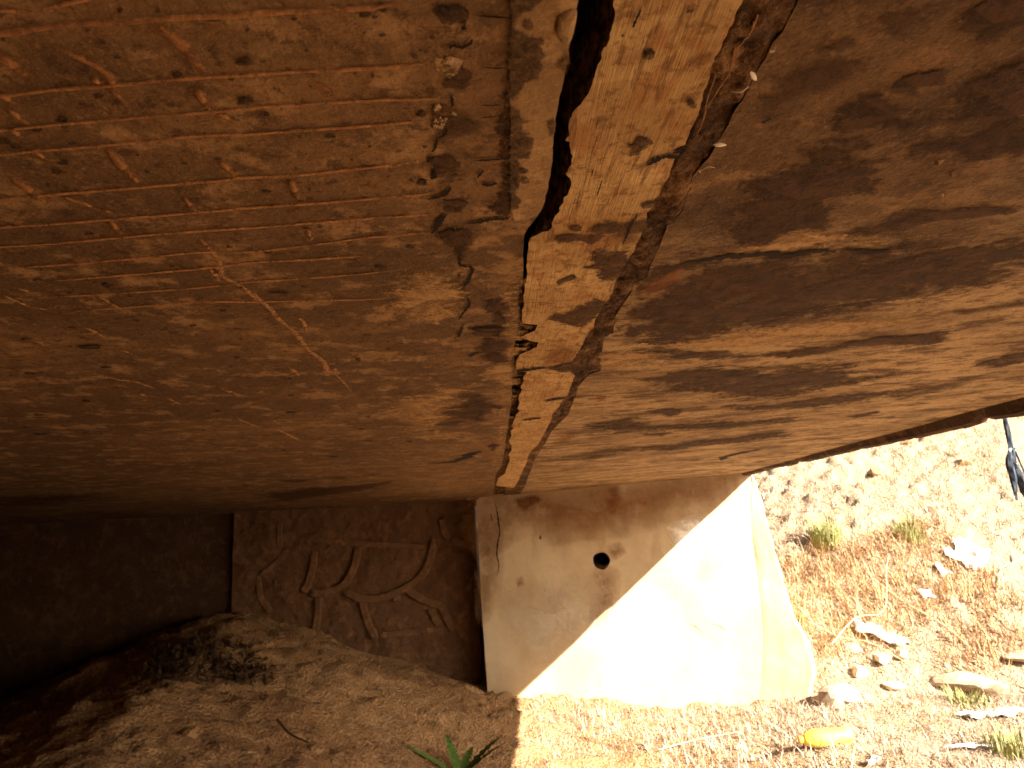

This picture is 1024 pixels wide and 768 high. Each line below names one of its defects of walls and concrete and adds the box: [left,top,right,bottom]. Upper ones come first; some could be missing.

water stain [442,66,473,90]
water stain [488,0,546,216]
water stain [430,116,480,179]
crack [647,148,685,166]
water stain [547,63,1024,460]
crack [686,249,891,263]
water stain [468,297,512,364]
crack [515,366,548,374]
water stain [435,391,504,426]
crack [522,397,567,421]
crack [719,449,762,461]
crack [490,501,500,574]